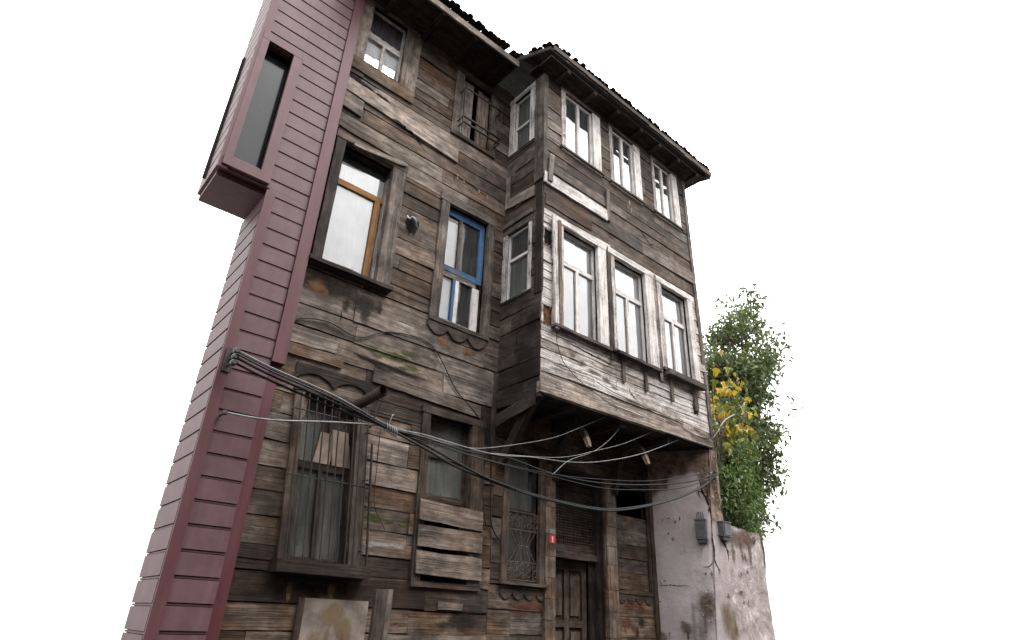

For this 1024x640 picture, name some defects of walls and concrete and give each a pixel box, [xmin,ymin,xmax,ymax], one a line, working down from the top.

damp [692,594,738,640]